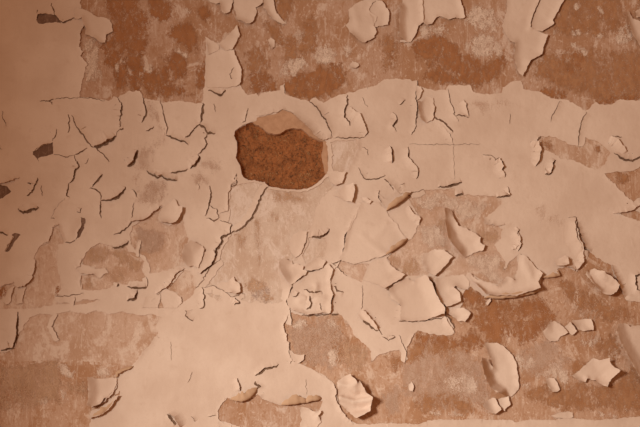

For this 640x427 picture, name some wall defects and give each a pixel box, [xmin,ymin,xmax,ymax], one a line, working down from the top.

peeling [33,10,64,26]
peeling [74,0,640,130]
crack [18,68,236,257]
crack [113,277,148,301]
crack [185,184,269,321]
peeling [0,105,640,427]
crack [281,80,510,325]
crack [379,279,455,362]
crack [530,134,556,175]
crack [564,216,589,259]
crack [578,112,591,146]
crack [608,136,640,162]